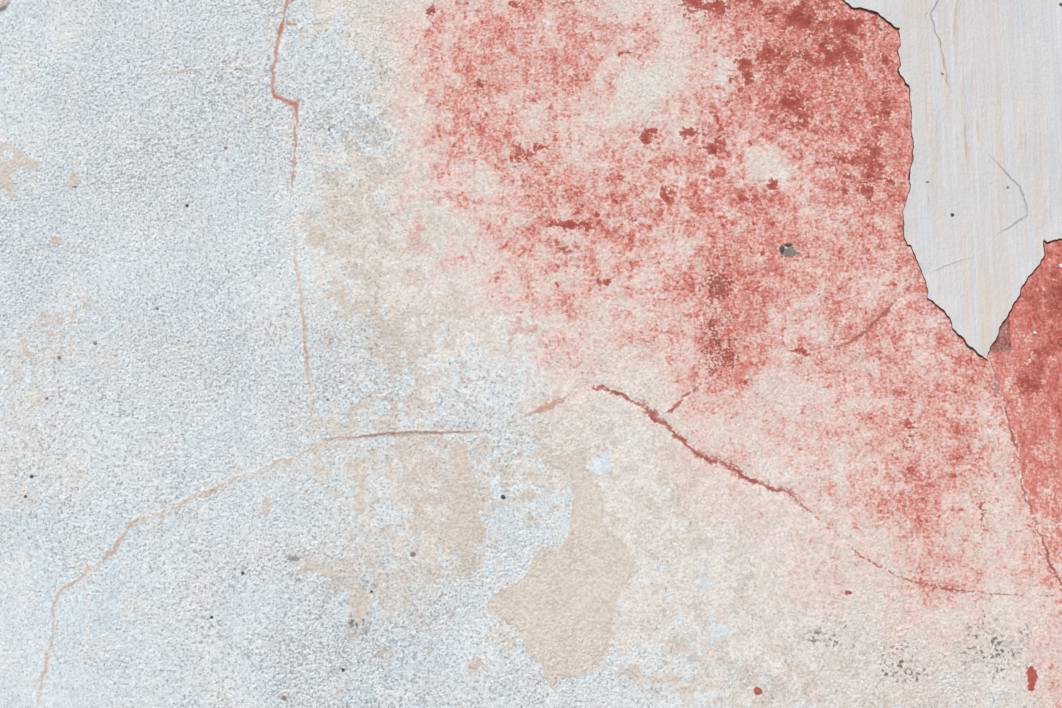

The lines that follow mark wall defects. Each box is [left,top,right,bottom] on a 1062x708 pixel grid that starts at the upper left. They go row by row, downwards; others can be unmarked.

crack [269,0,299,185]
crack [8,213,490,708]
peeling [369,0,1062,708]
crack [525,359,1062,597]